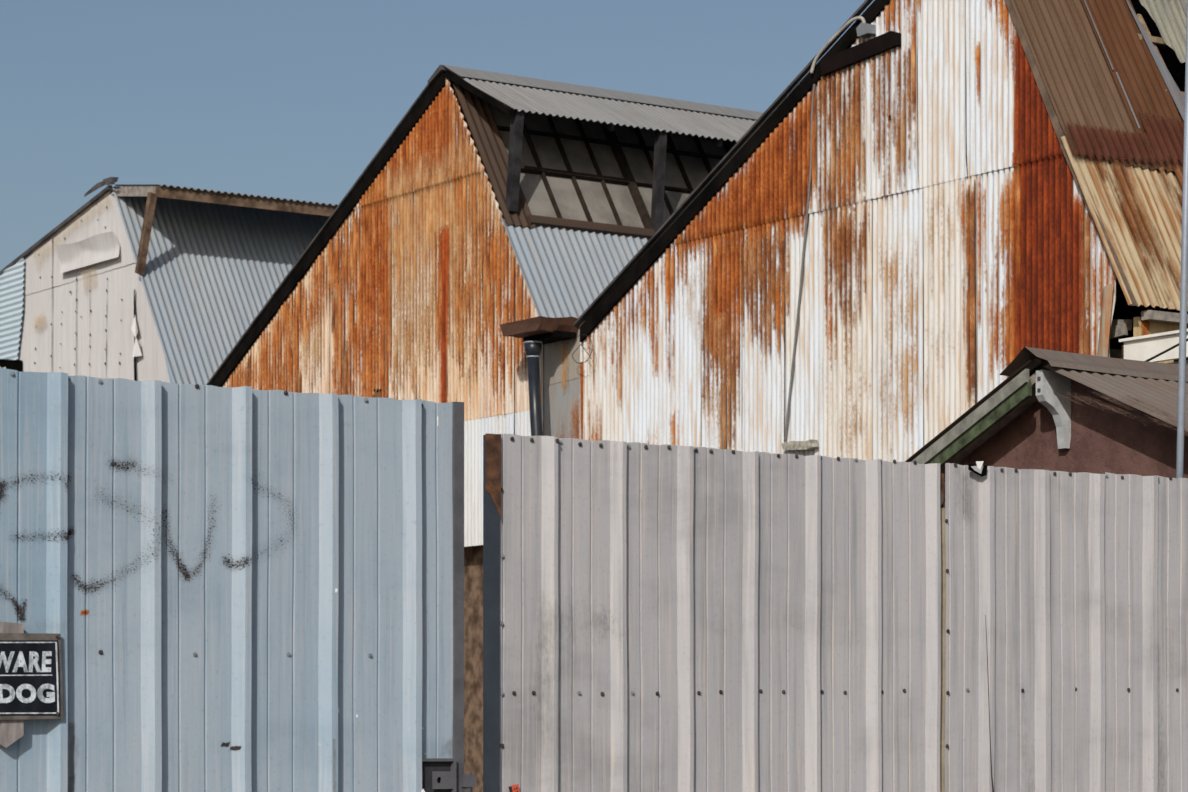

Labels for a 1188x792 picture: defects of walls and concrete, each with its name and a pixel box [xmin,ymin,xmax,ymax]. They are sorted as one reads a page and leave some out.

corrosion [227,80,530,414]
corrosion [560,0,928,449]
corrosion [929,0,1184,408]